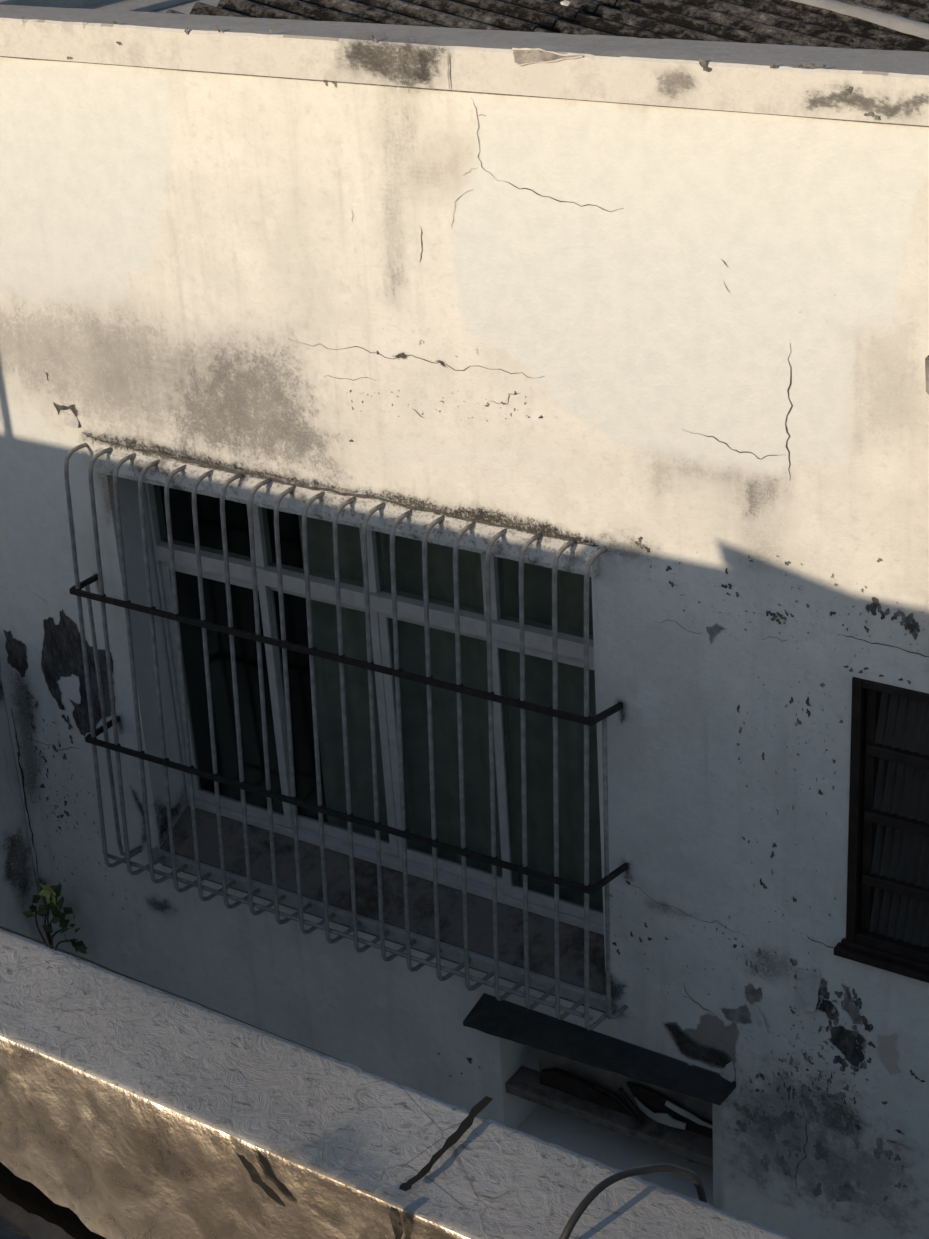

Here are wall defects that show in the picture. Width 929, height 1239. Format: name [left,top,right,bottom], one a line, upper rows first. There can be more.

damp [339,34,443,87]
crack [0,52,929,263]
damp [805,85,928,119]
crack [289,339,541,404]
crack [682,346,793,481]
peeling [659,555,924,684]
peeling [3,609,141,916]
crack [0,926,340,1060]
peeling [663,914,925,1202]
crack [390,1096,493,1239]